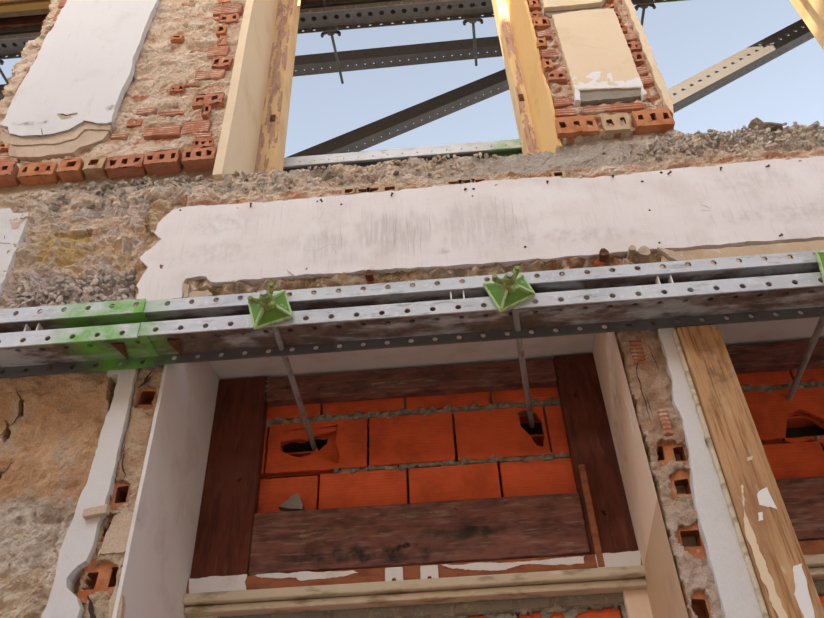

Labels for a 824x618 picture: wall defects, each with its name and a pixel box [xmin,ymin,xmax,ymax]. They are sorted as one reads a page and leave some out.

flaking render [134,194,187,306]
crack [0,388,22,435]
spalling [137,387,157,410]
spalling [266,427,341,477]
spalling [646,441,692,500]
spalling [77,481,131,604]
spalling [676,522,708,565]
peeling [741,485,788,618]
spalling [681,585,711,618]
peeling [793,563,824,618]